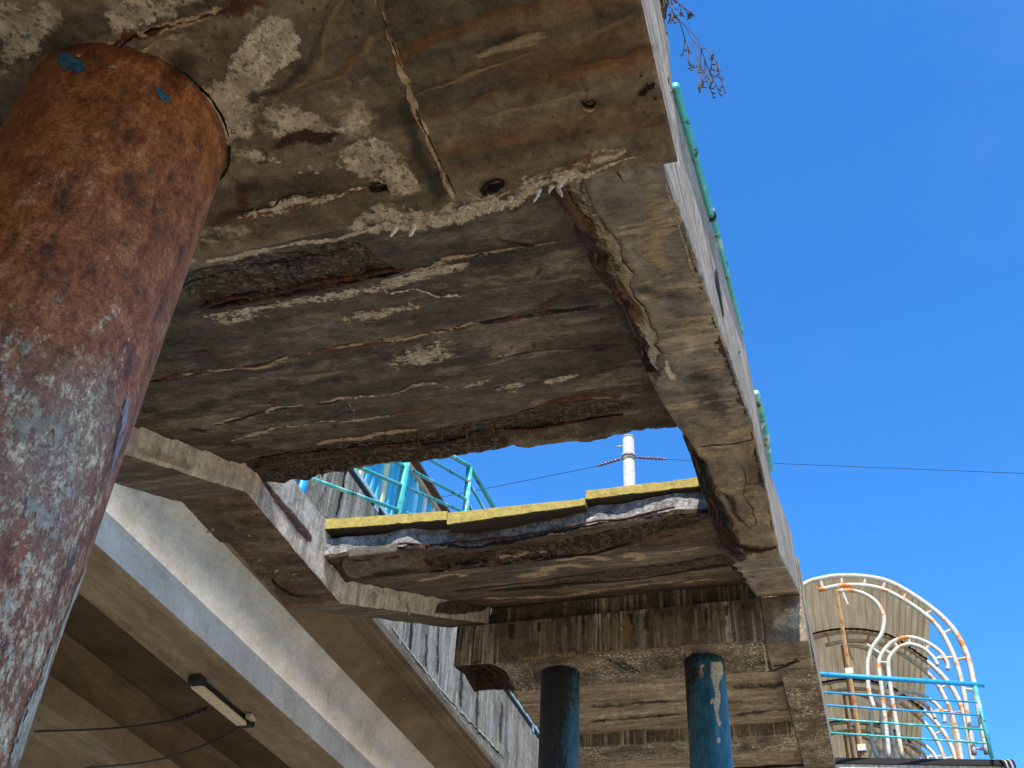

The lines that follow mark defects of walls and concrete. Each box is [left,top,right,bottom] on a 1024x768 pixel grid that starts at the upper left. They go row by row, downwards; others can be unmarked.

water stain [202,5,374,142]
crack [375,0,457,200]
spalling [475,180,511,201]
spalling [183,242,409,309]
spalling [545,178,662,381]
spalling [244,390,631,542]
spalling [396,435,751,615]
crack [702,439,762,526]
peeling [699,661,724,743]